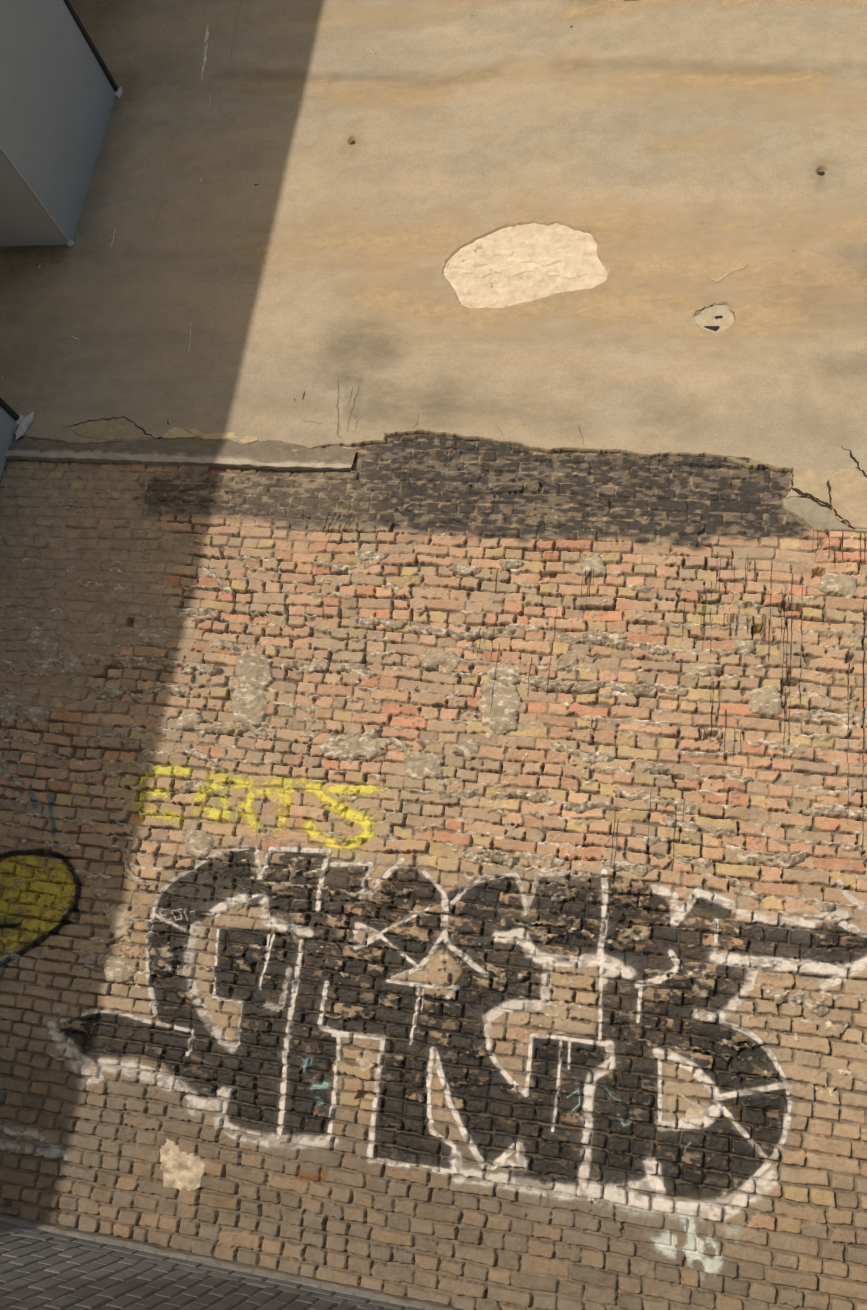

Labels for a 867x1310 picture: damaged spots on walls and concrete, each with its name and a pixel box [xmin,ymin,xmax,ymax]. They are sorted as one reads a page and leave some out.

spalling [443,223,608,308]
spalling [694,305,734,333]
flaking render [161,426,259,444]
crack [789,446,867,529]